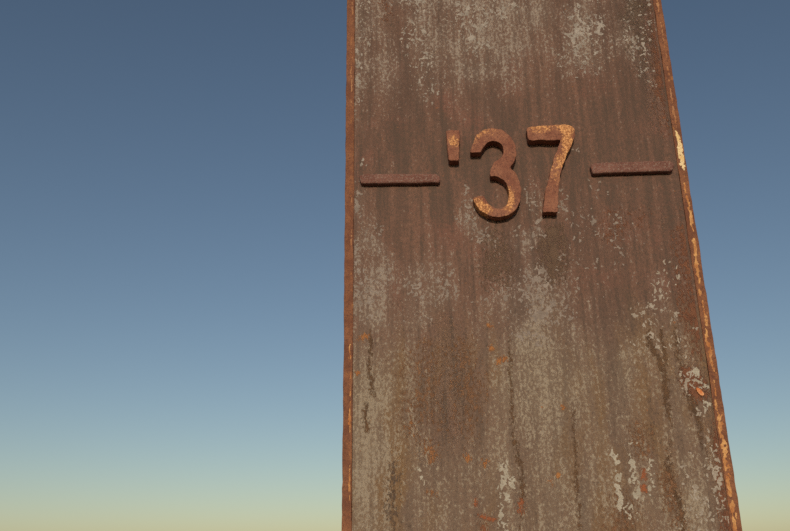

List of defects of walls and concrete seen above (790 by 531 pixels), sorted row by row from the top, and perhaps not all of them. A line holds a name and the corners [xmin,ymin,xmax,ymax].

peeling [391,0,531,104]
peeling [550,0,685,170]
peeling [455,184,498,246]
peeling [498,179,638,347]
corrosion [355,332,376,397]
peeling [630,183,737,531]
corrosion [645,208,731,531]
peeling [497,460,516,531]
corrosion [489,344,525,529]
corrosion [601,420,654,531]
peeling [606,442,656,524]